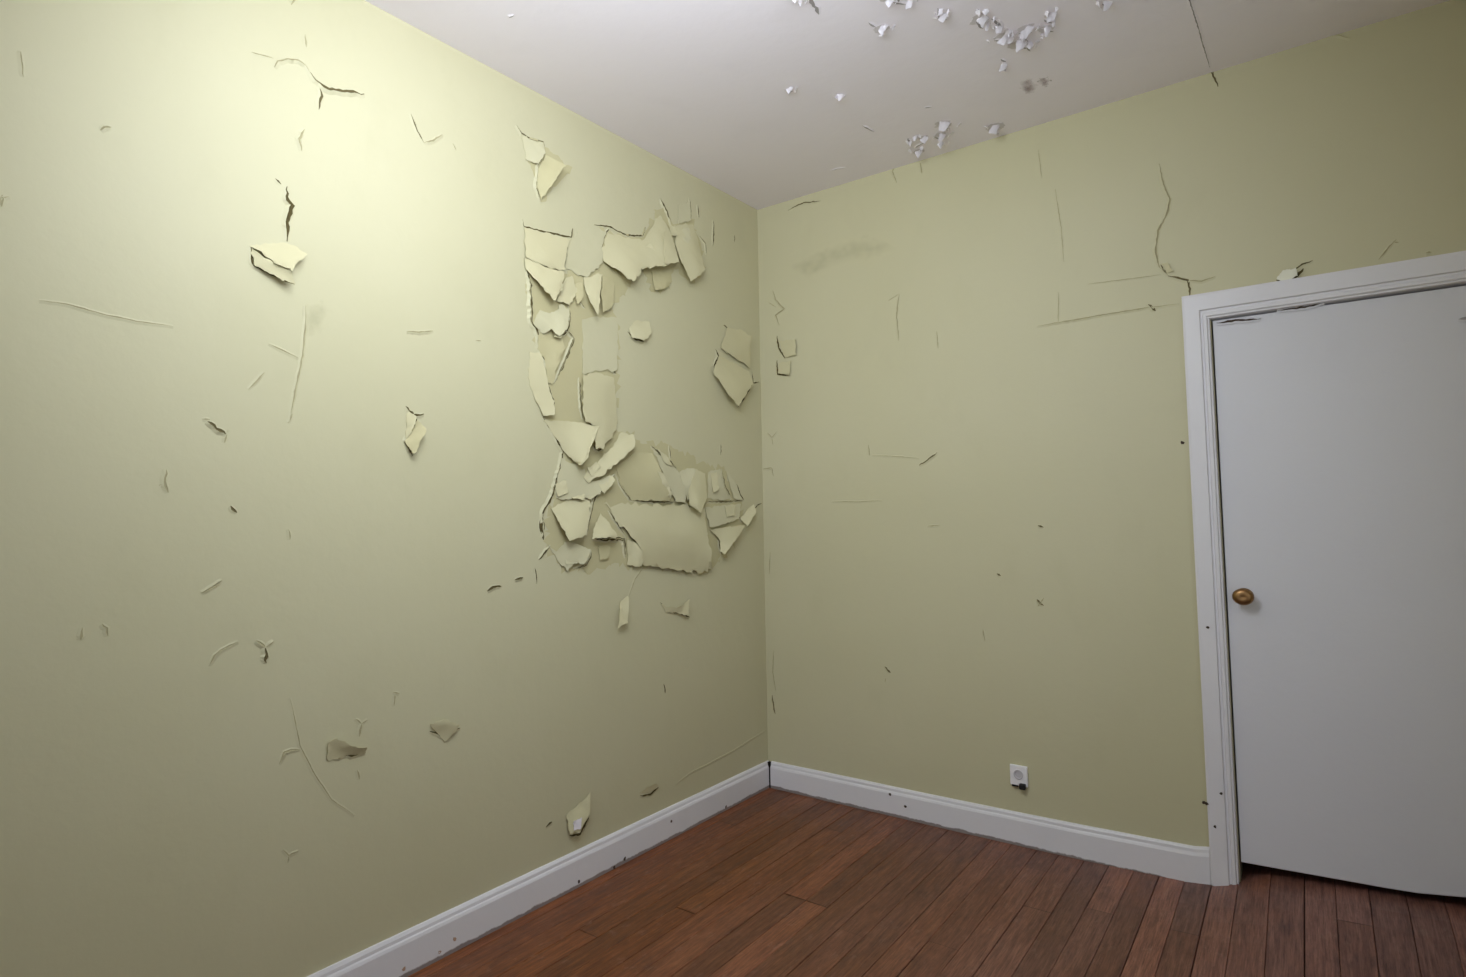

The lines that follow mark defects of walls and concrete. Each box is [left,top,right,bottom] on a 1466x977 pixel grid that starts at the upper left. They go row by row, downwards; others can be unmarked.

crack [251,0,365,151]
peeling [792,0,821,15]
peeling [868,0,918,37]
peeling [969,6,1058,72]
crack [1187,0,1219,88]
peeling [515,125,572,202]
peeling [247,178,308,287]
crack [1037,150,1216,328]
crack [1217,303,1325,325]
peeling [402,405,426,457]
peeling [487,198,762,628]
peeling [546,792,591,838]